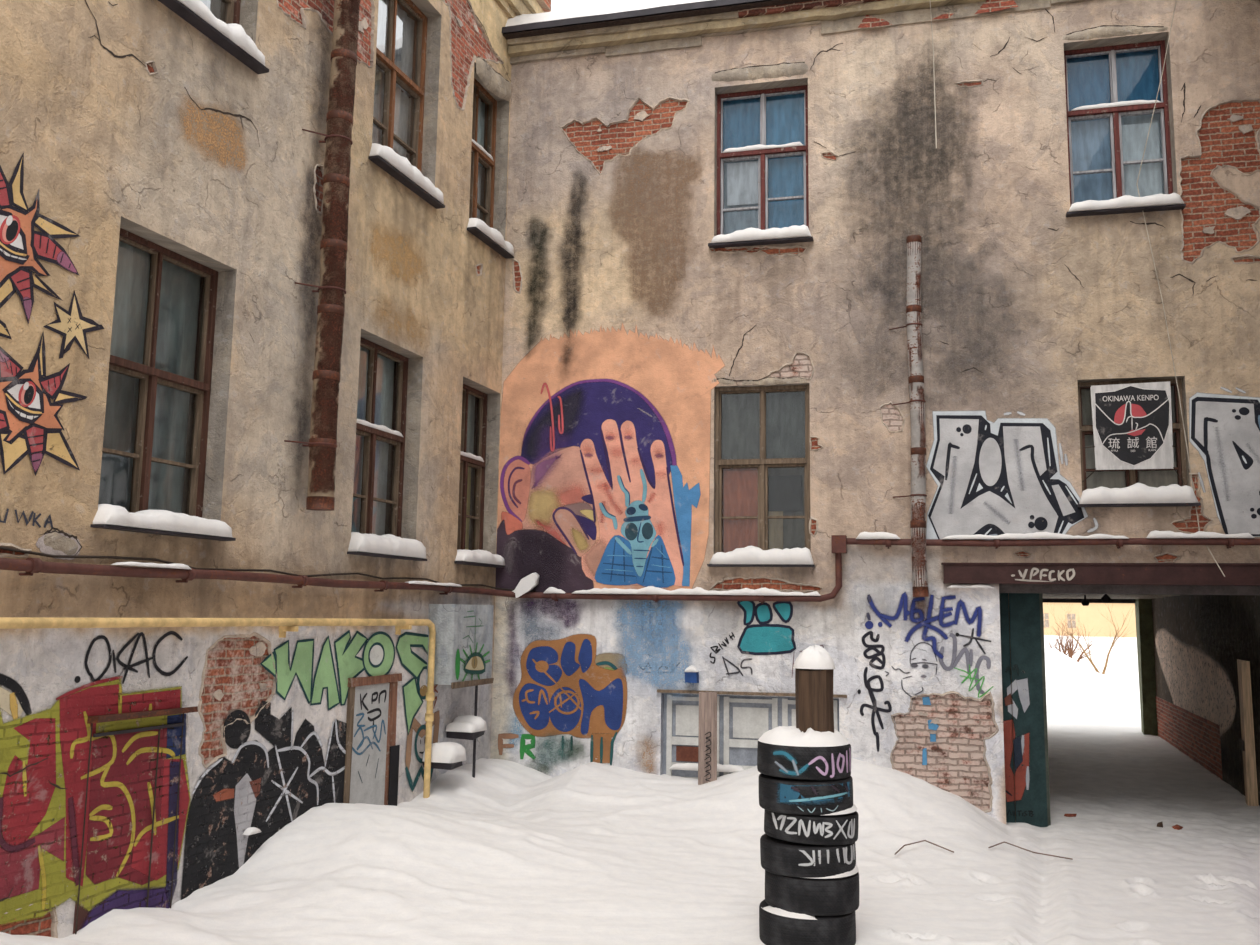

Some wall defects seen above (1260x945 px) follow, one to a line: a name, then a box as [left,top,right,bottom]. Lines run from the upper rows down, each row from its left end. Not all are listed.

crack [85,0,145,66]
corrosion [309,0,360,492]
leakage [527,219,548,349]
leakage [561,176,585,332]
flaking render [561,97,690,175]
leakage [612,150,700,314]
leakage [858,67,1009,381]
flaking render [1178,98,1260,264]
corrosion [909,272,926,476]
corrosion [911,505,927,614]
flaking render [198,632,277,768]
flaking render [890,691,999,813]